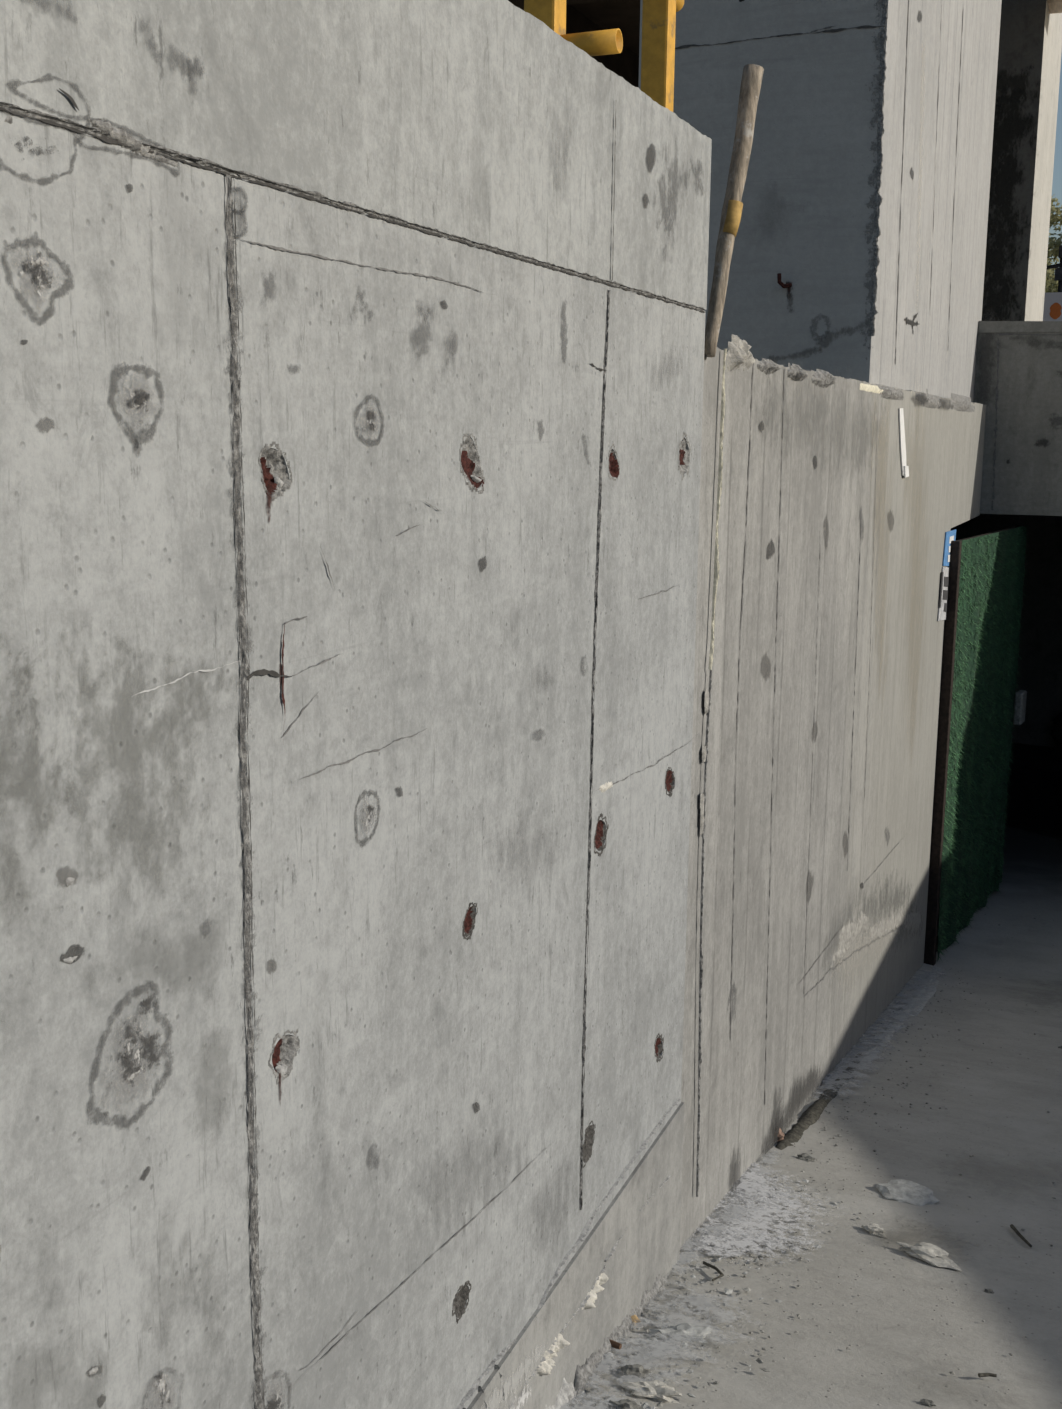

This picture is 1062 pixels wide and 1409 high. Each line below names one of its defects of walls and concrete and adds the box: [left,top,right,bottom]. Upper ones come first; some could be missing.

spalling [121,992,162,1084]
crack [0,107,705,1409]